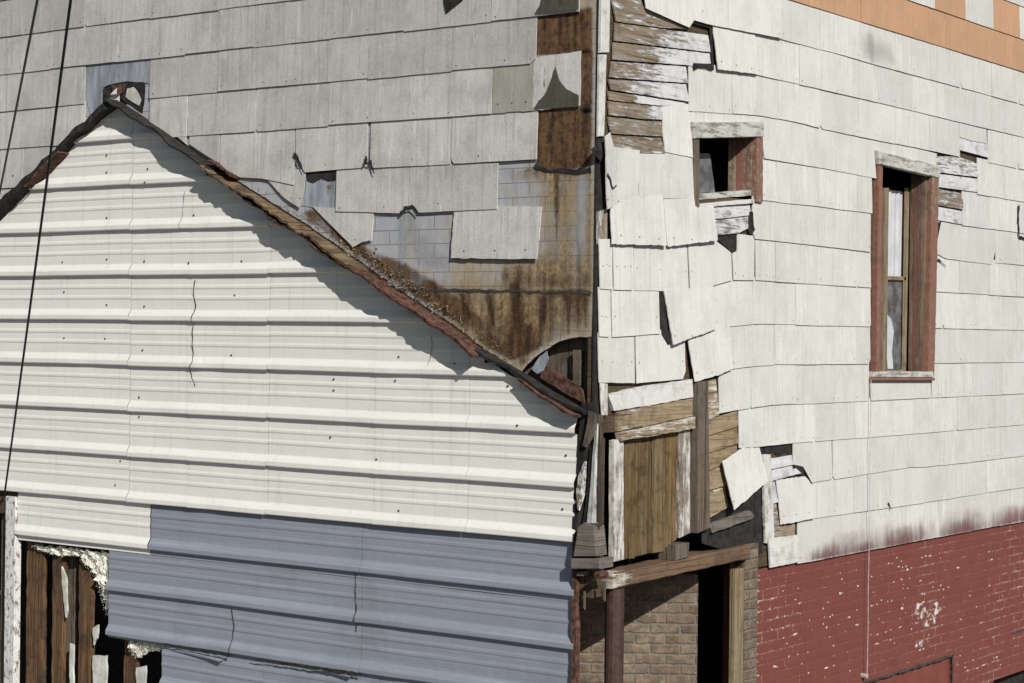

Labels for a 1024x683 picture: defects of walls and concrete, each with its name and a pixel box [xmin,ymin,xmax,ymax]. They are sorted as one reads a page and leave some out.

water stain [536,0,579,13]
water stain [534,67,579,110]
peeling [607,0,713,154]
peeling [936,138,989,224]
corrosion [205,159,590,362]
peeling [704,378,738,517]
peeling [754,444,805,544]